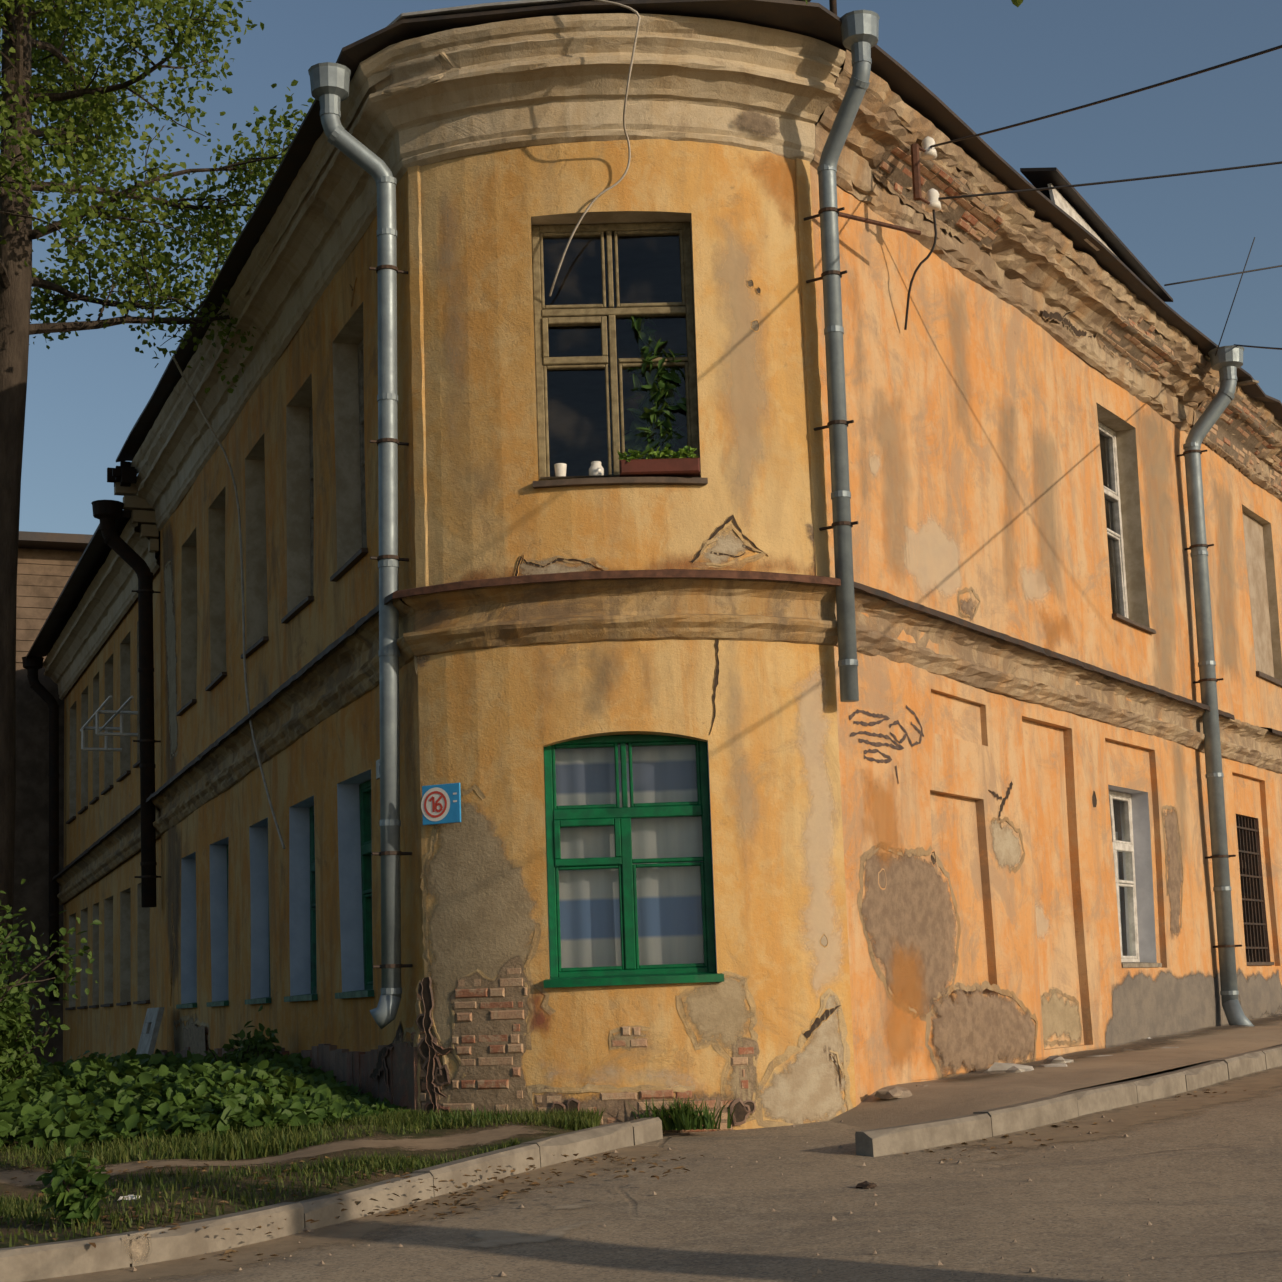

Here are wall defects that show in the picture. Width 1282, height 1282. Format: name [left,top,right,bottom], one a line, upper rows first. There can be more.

flaking render [872,145,1004,248]
flaking render [1094,311,1179,378]
flaking render [1193,377,1282,494]
peeling [513,555,609,576]
flaking render [692,523,768,569]
crack [709,639,720,735]
flaking render [991,817,1025,873]
peeling [413,675,853,1134]
peeling [857,842,1082,1079]